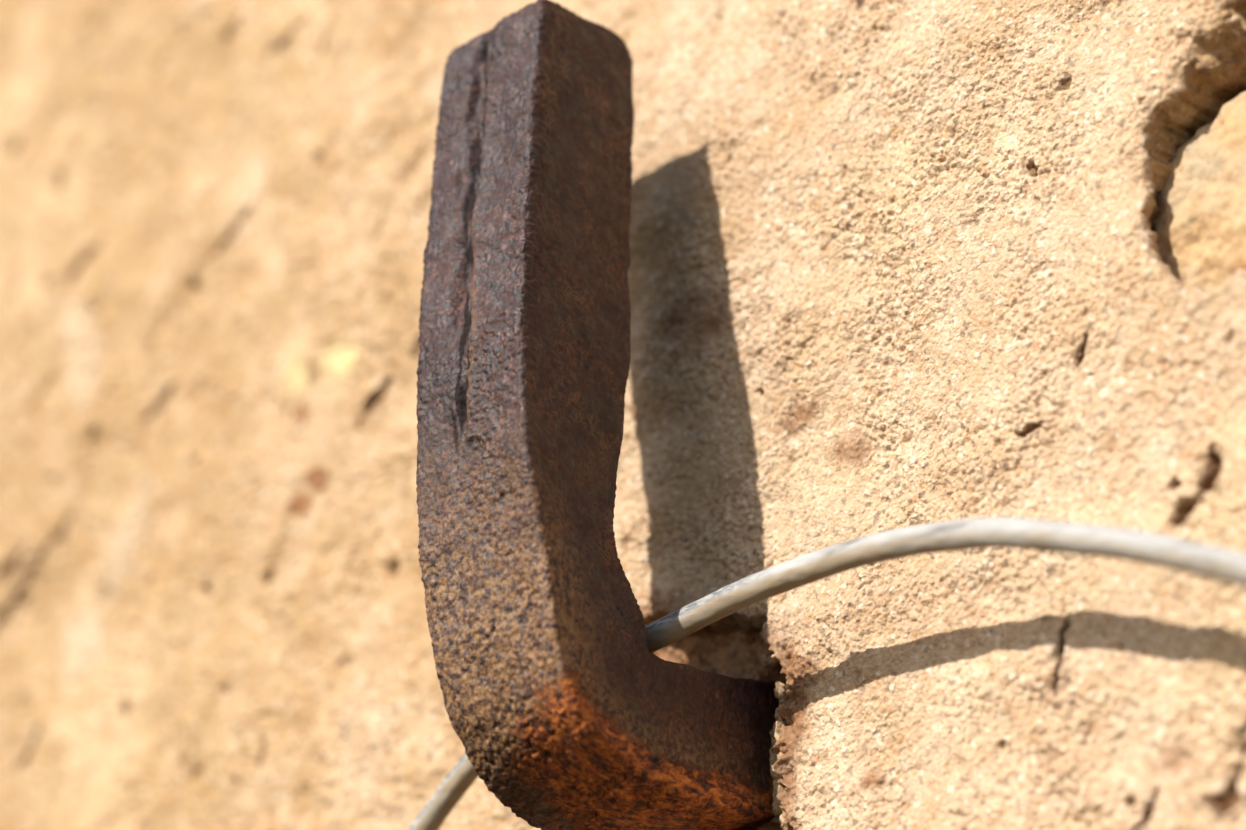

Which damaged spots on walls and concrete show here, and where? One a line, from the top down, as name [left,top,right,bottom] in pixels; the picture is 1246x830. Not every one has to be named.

spalling [1144,0,1246,292]
corrosion [517,651,812,830]